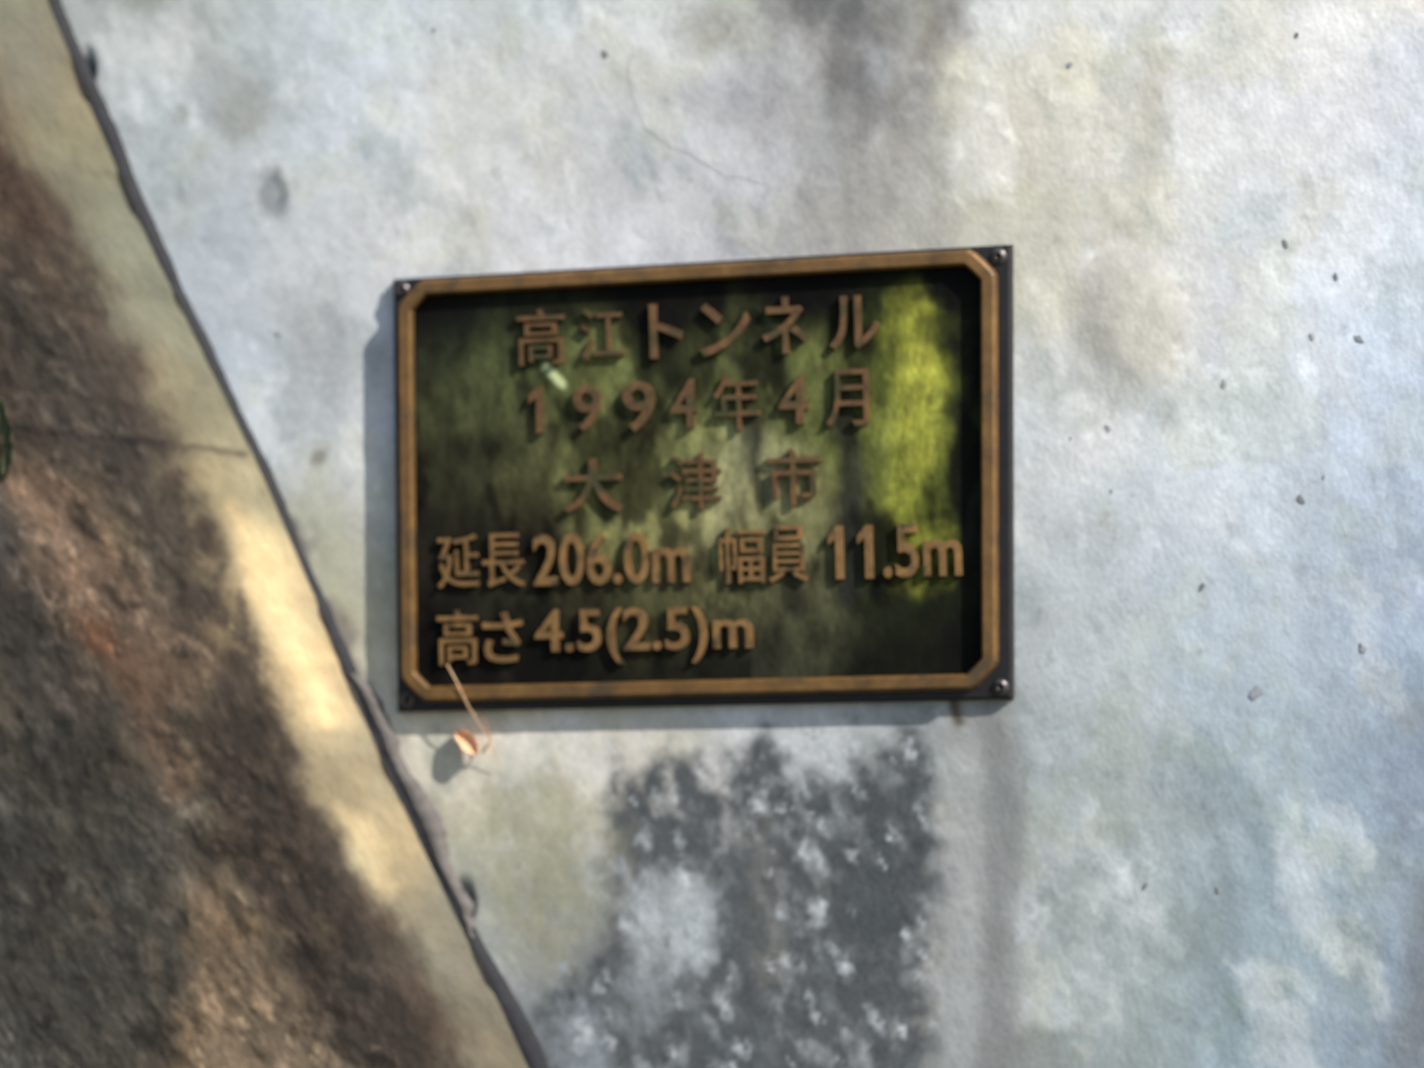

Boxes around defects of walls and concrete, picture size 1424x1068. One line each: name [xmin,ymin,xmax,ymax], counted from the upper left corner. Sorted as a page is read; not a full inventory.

water stain [628,0,1006,259]